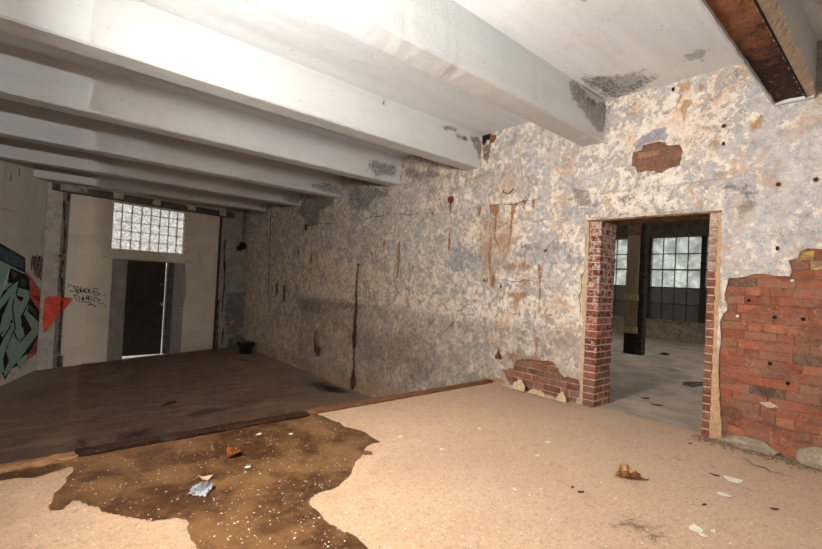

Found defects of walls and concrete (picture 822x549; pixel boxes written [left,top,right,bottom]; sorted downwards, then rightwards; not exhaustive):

spalling [705,0,816,102]
spalling [633,128,683,173]
rust [477,200,535,288]
rust [350,264,359,390]
spalling [504,221,590,405]
spalling [709,212,822,459]
damp [0,414,380,549]